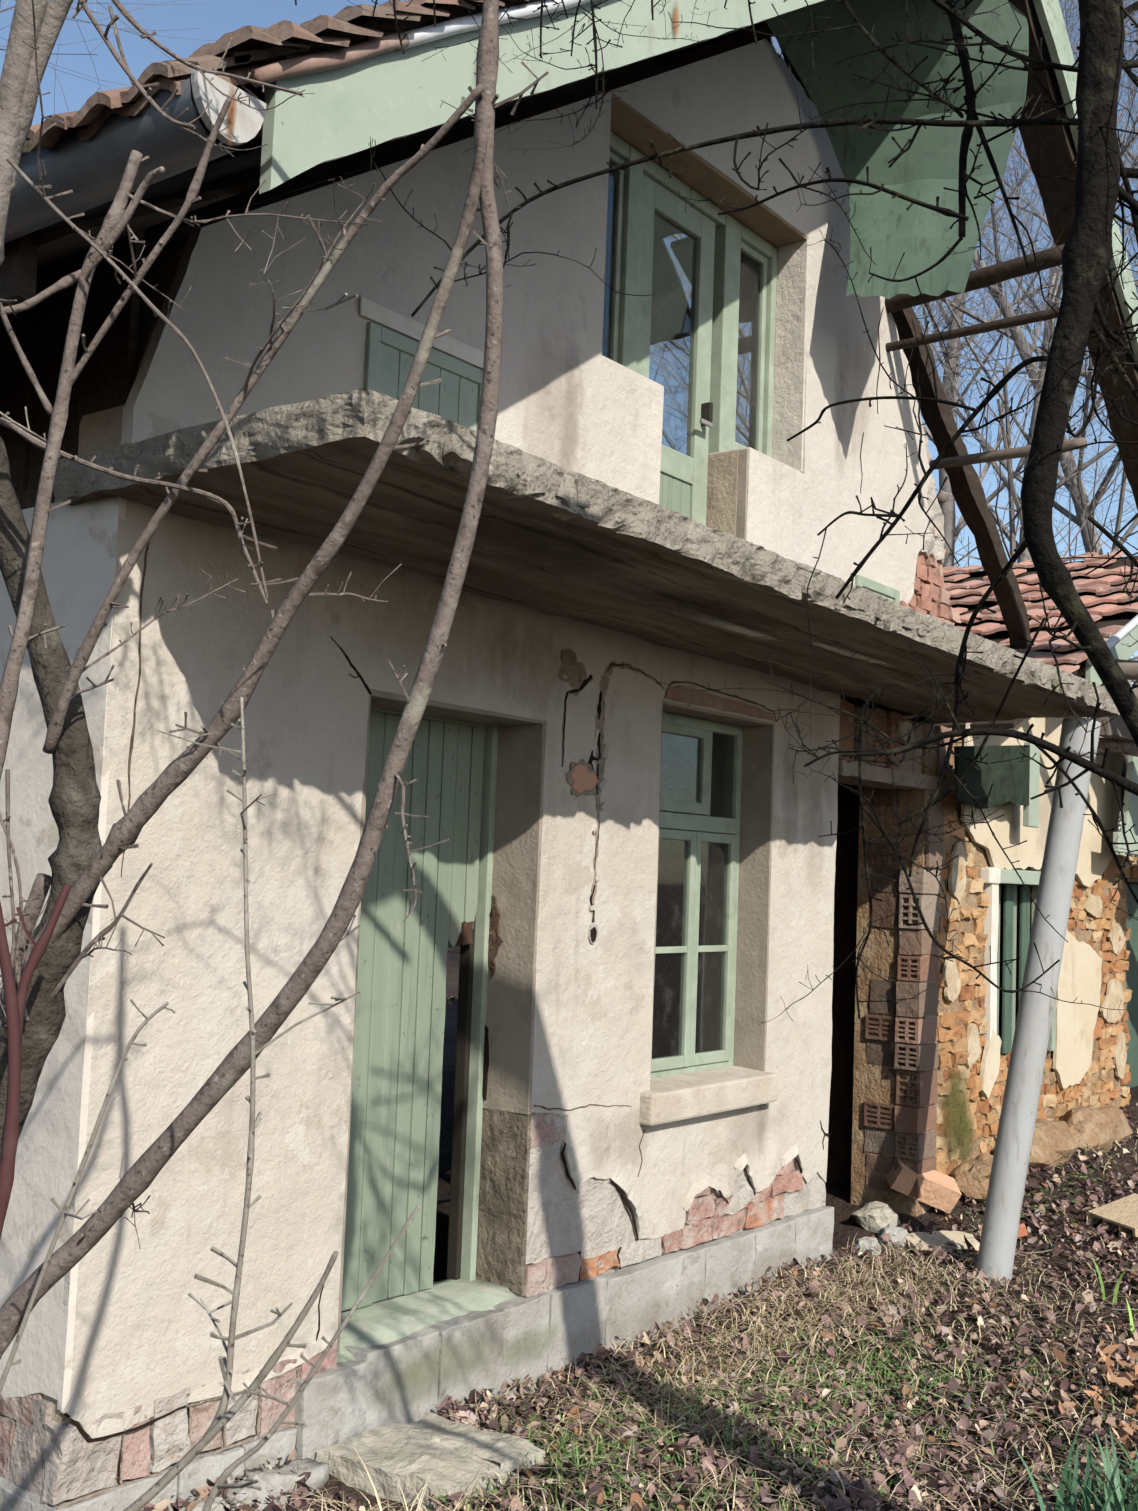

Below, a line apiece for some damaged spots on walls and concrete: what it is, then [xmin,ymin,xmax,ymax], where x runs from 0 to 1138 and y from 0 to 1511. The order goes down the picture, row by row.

flaking render [565,758,600,797]
crack [561,660,832,923]
flaking render [476,1025,826,1297]
flaking render [0,1328,337,1509]